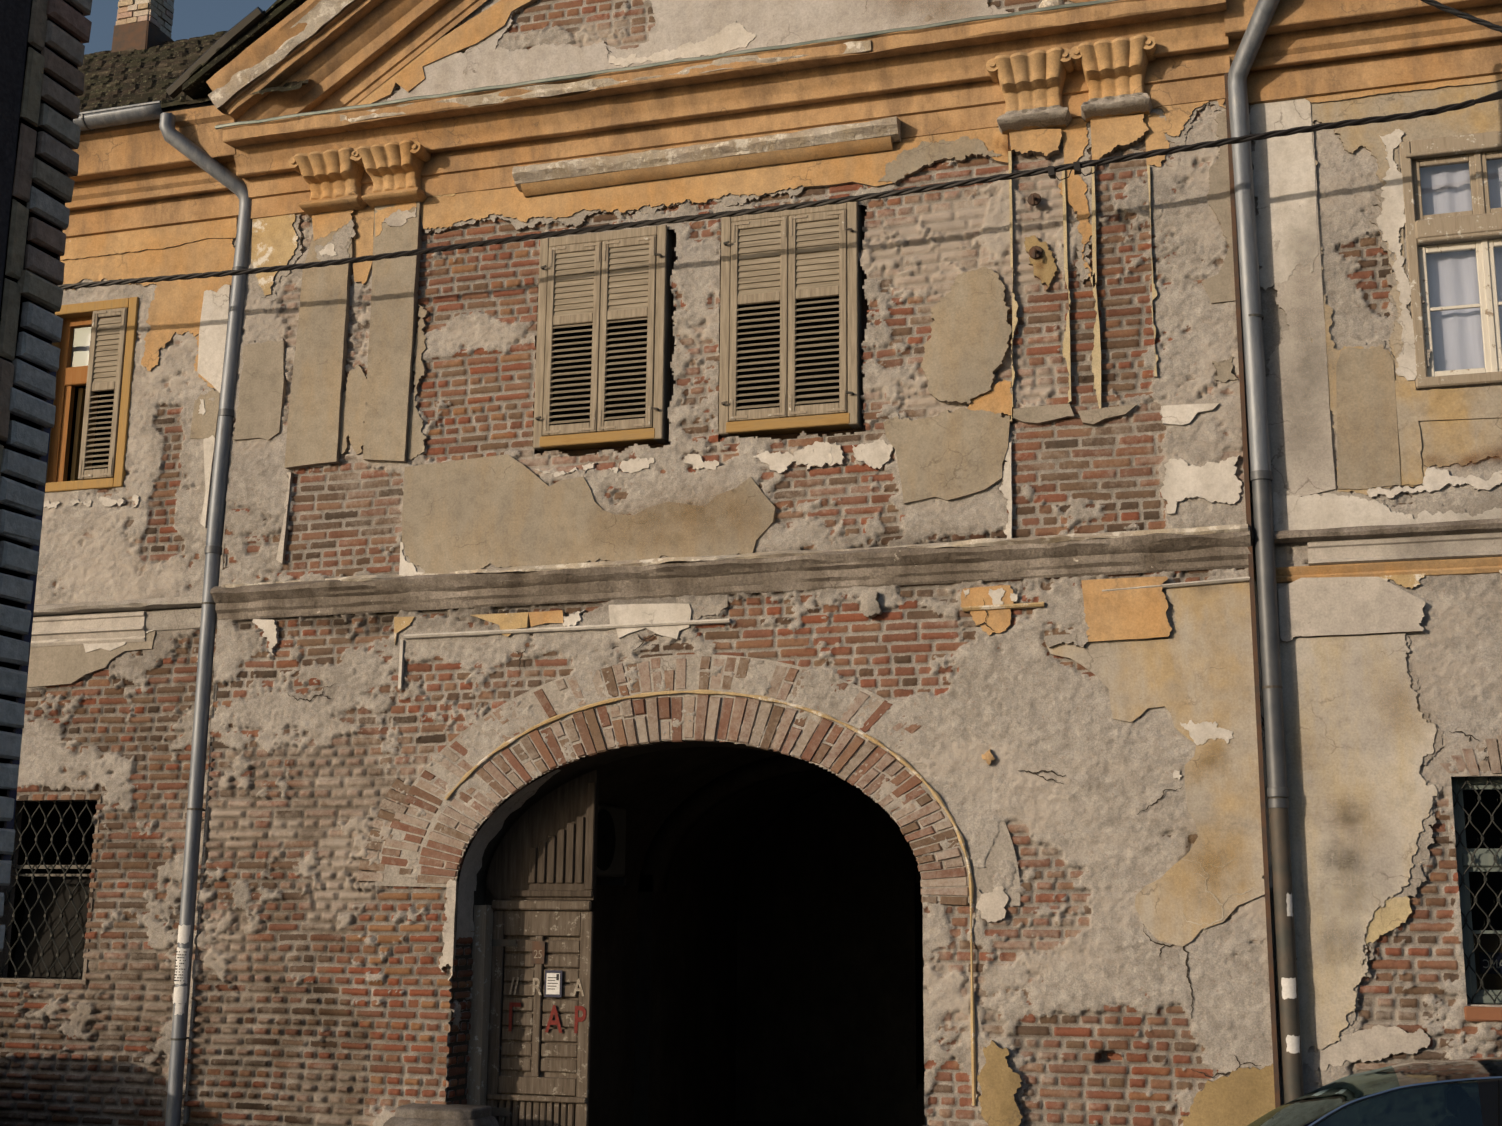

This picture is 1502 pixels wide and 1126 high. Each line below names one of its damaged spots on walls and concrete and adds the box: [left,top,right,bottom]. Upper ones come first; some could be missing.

flaking render [354,0,1034,106]
spalling [44,99,1242,581]
flaking render [1249,81,1502,531]
flaking render [27,629,156,687]
peeling [252,619,280,656]
peeling [394,617,415,645]
peeling [471,609,586,637]
flaking render [1380,573,1426,589]
spalling [312,769,561,1112]
spalling [974,839,1094,965]
spalling [978,1002,1213,1126]